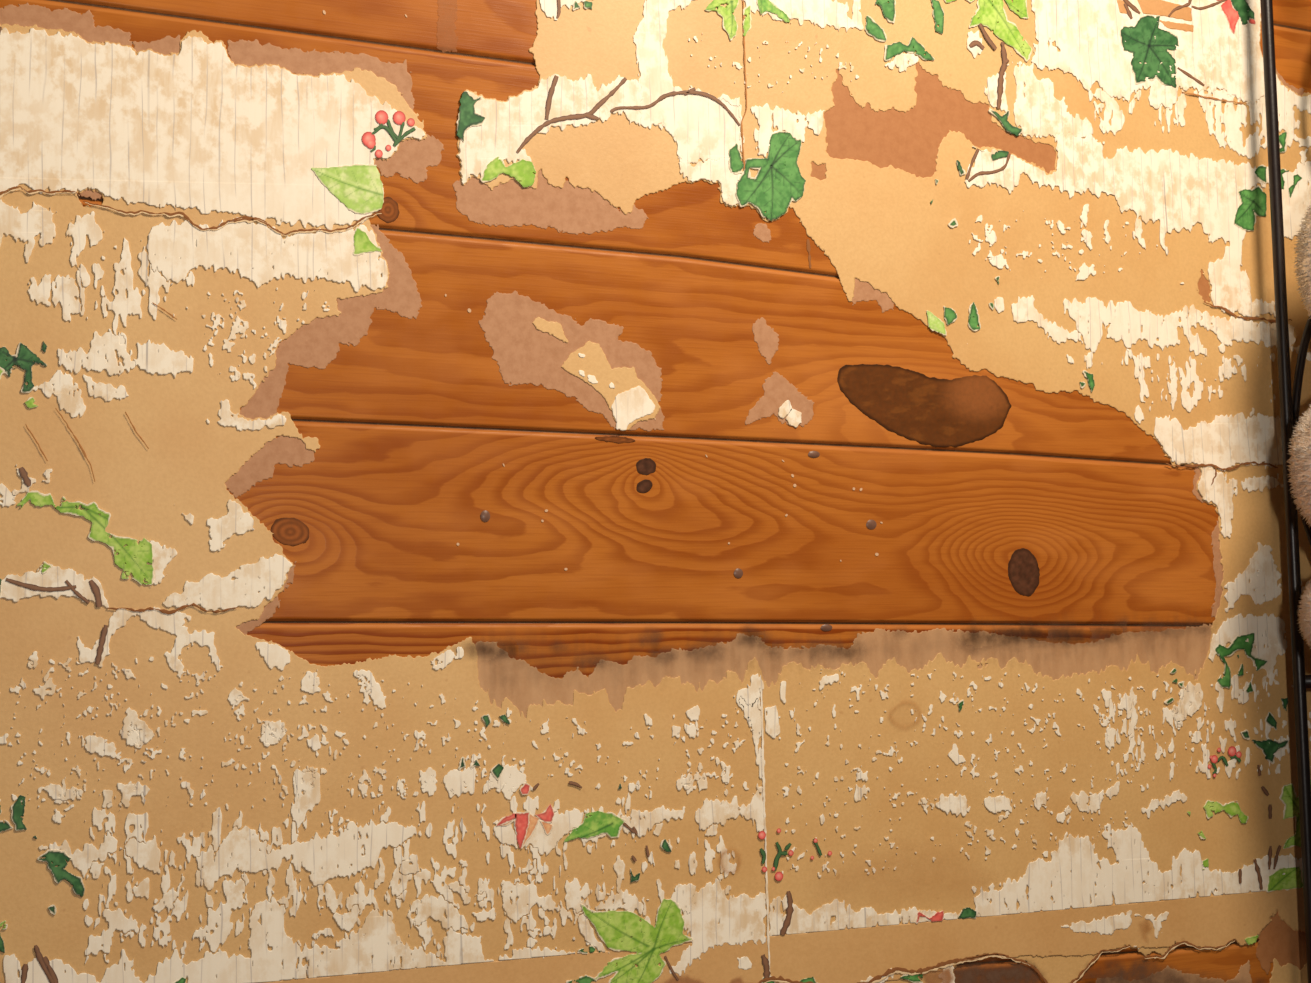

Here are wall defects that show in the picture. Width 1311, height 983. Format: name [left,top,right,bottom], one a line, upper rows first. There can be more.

peeling [1260,0,1311,96]
crack [0,186,382,236]
peeling [0,0,1224,758]
crack [758,975,813,983]
peeling [943,955,1045,983]
crack [857,939,1234,983]
peeling [1075,911,1307,983]